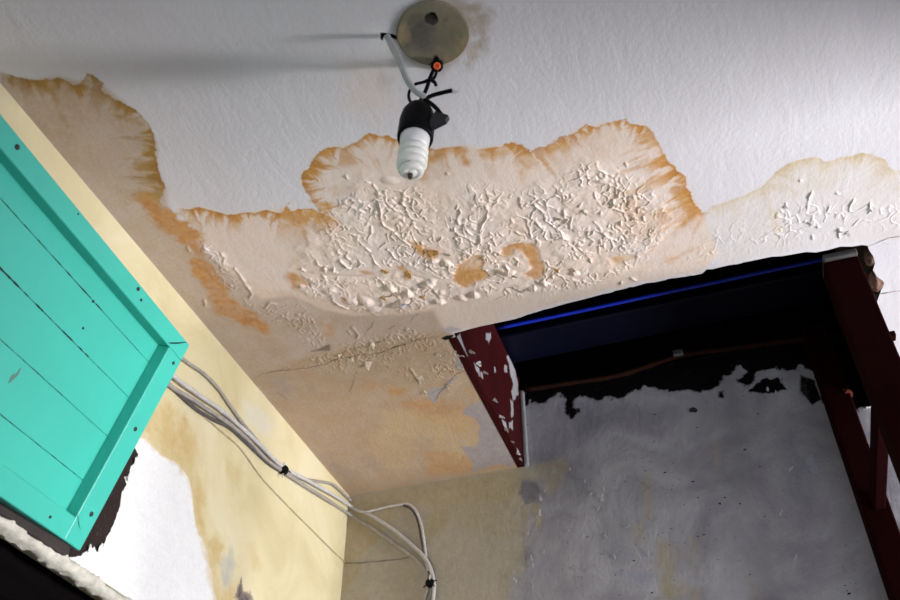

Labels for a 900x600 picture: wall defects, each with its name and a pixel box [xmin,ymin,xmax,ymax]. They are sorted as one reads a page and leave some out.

damp [0,69,900,374]
peeling [668,191,900,301]
damp [238,396,277,444]
crack [258,314,432,399]
peeling [262,326,523,473]
damp [524,342,824,422]
spalling [742,375,788,395]
peeling [68,448,138,558]
damp [140,393,264,600]
damp [247,352,573,600]